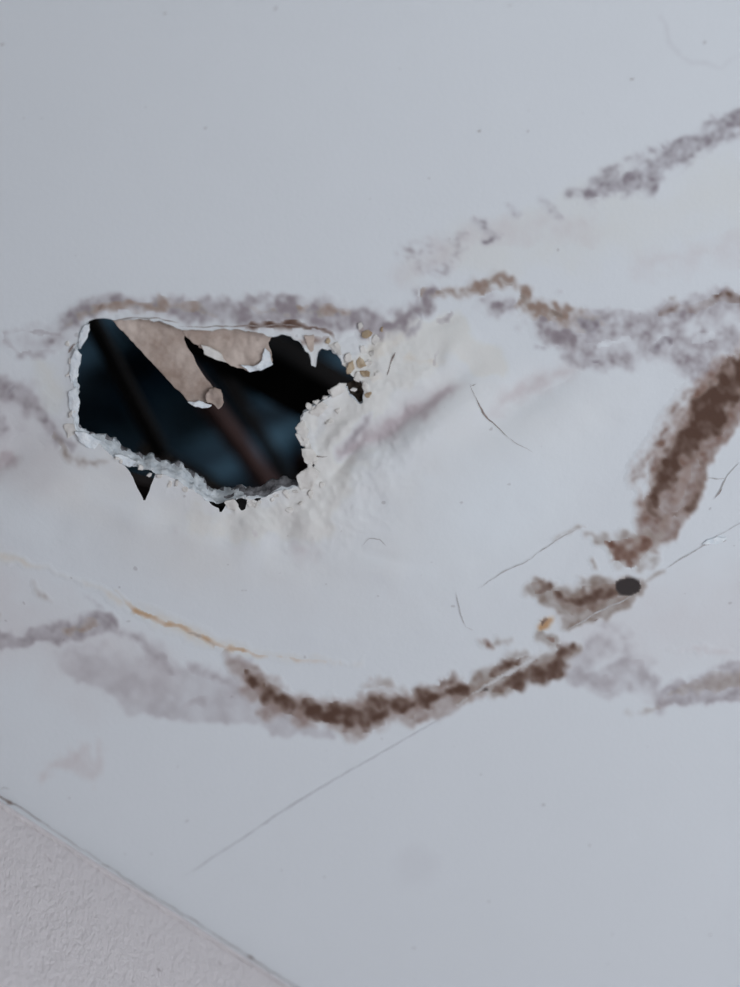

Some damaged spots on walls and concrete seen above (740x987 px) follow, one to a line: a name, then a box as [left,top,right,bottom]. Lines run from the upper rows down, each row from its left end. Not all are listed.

damp [535,103,740,223]
flaking render [63,306,515,576]
damp [0,214,740,748]